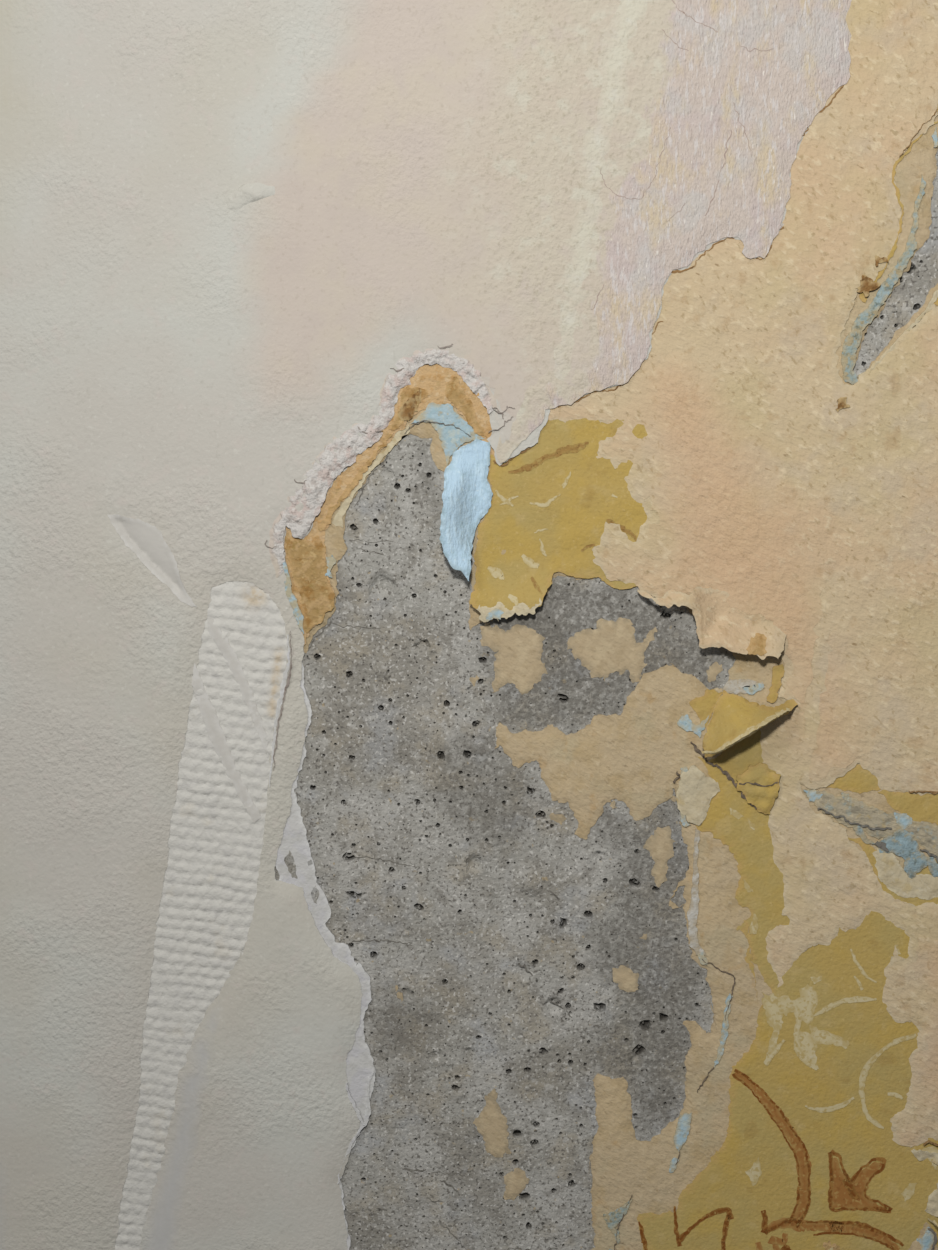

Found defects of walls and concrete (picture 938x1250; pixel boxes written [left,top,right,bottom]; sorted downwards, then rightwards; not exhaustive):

peeling [841,109,938,385]
peeling [269,0,852,1250]
peeling [803,764,938,900]
peeling [908,1183,938,1250]
spalling [911,1140,938,1165]